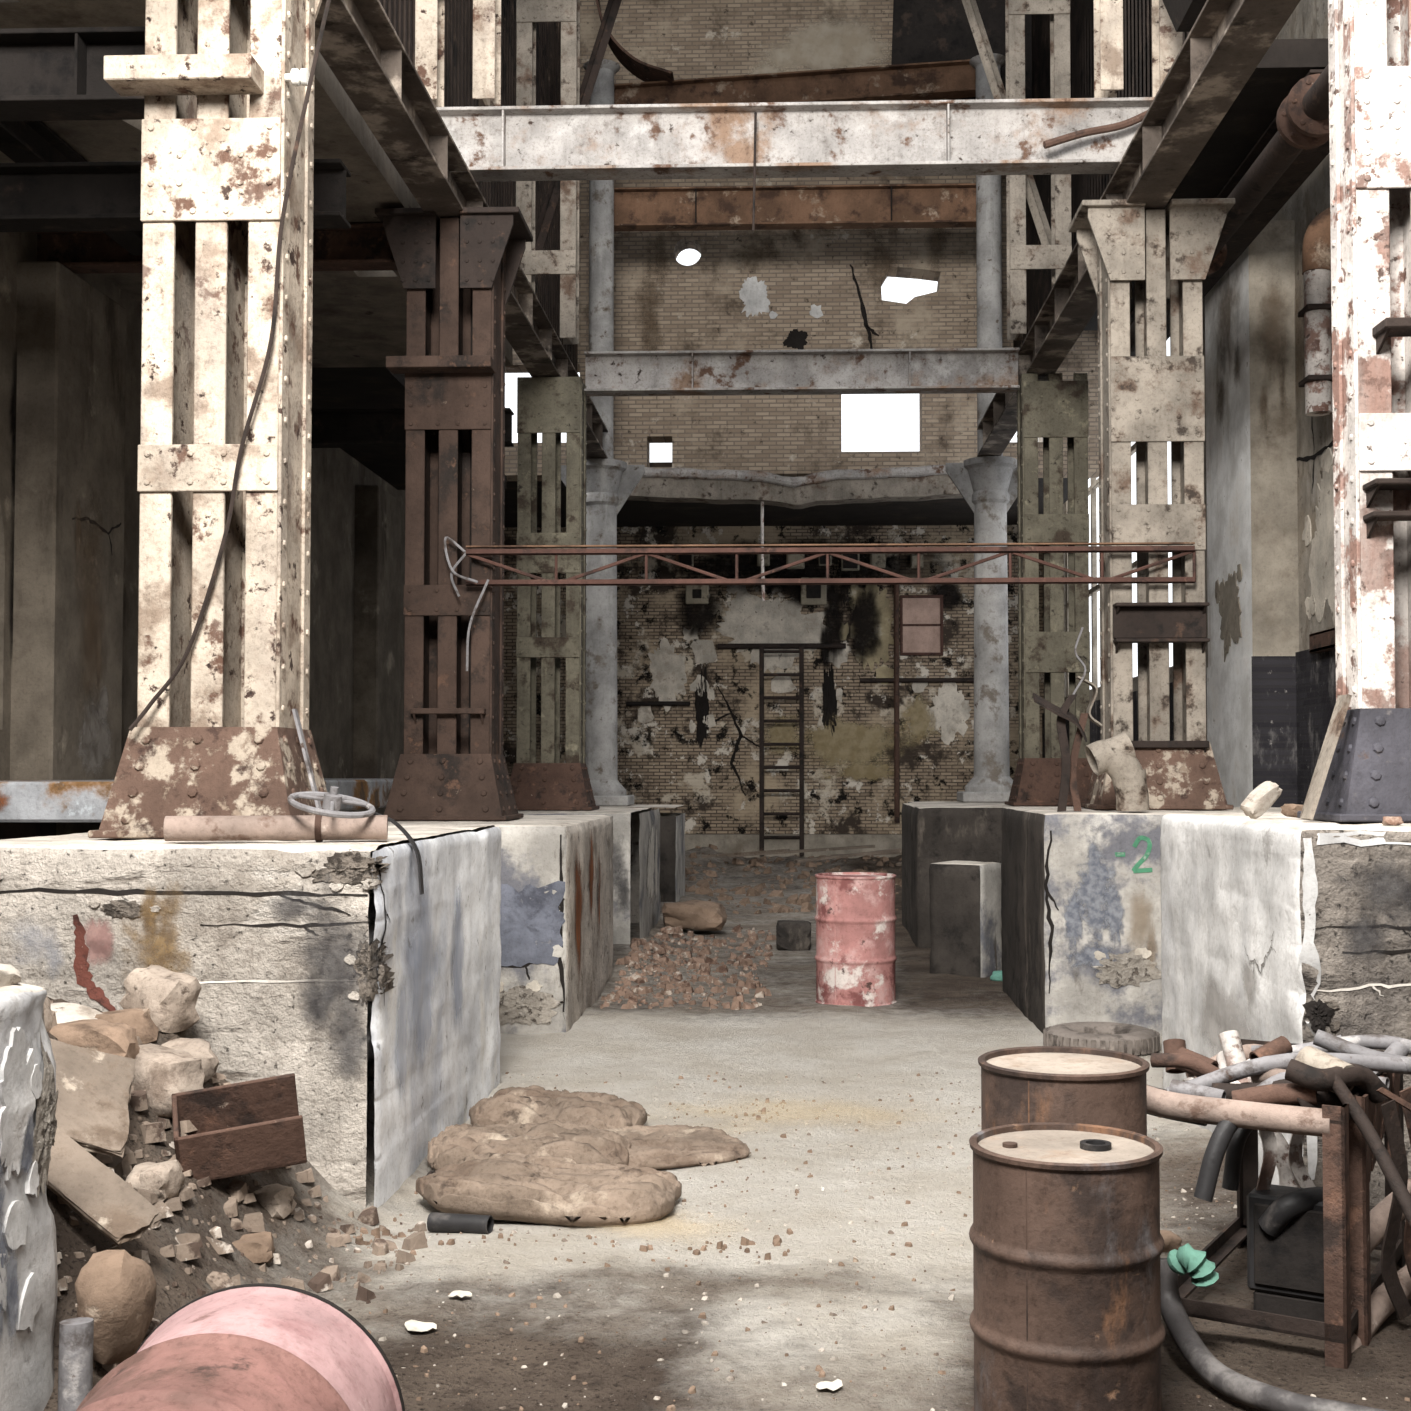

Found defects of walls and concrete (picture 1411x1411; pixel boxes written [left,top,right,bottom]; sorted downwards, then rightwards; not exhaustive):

peeling [638,585,894,749]
peeling [912,675,971,745]
corrosion [73,914,116,1011]
crack [0,869,390,947]
crack [198,979,385,1006]
damp [308,920,364,1074]
damp [1064,842,1155,969]
peeling [0,1027,58,1332]